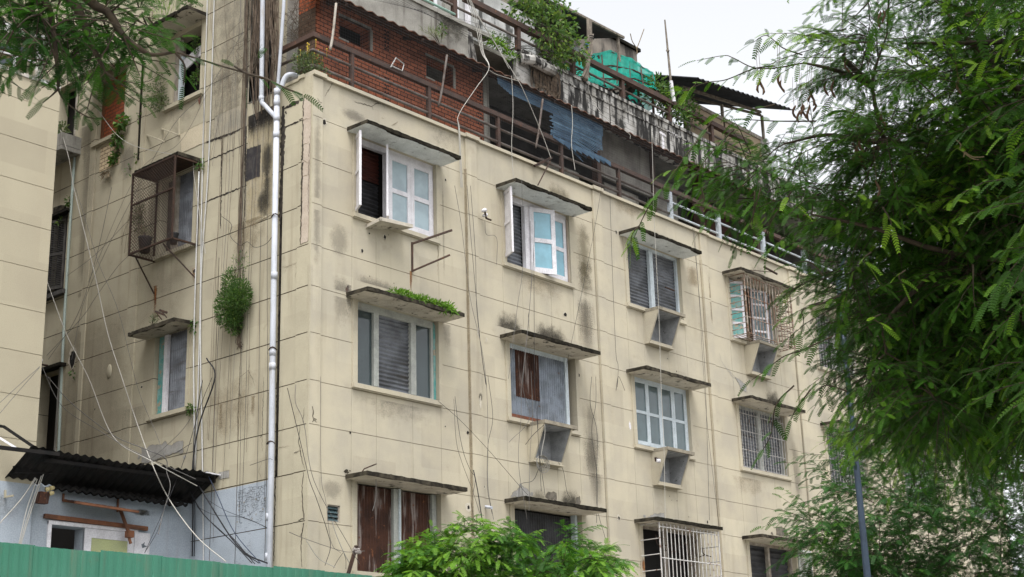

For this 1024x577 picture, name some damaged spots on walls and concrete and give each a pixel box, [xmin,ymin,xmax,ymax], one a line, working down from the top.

leakage [206,98,303,560]
leakage [500,313,529,331]